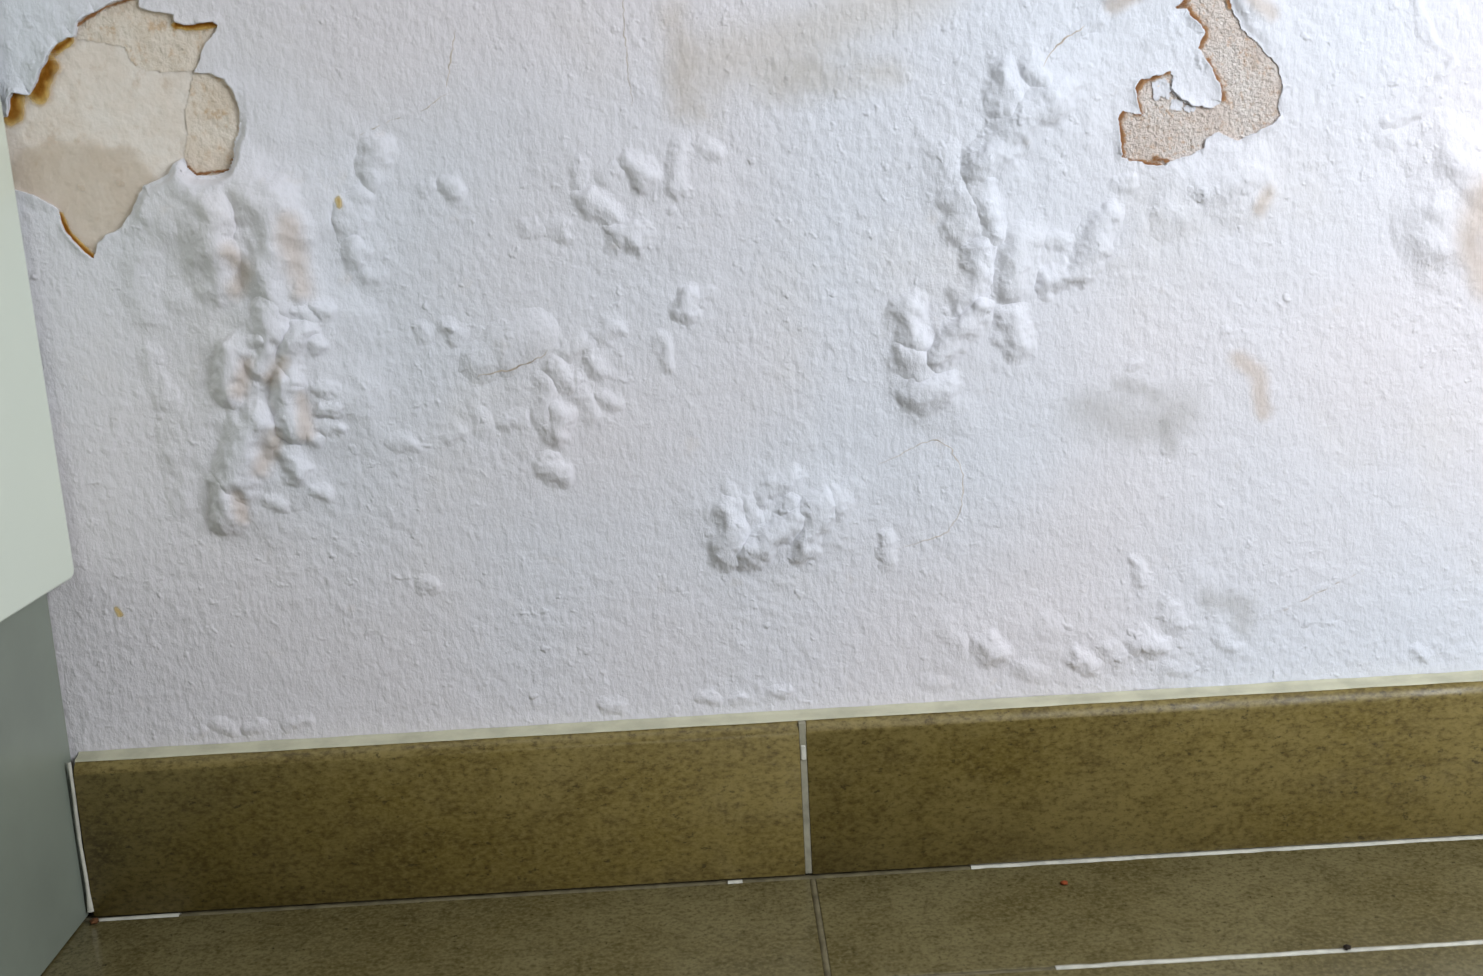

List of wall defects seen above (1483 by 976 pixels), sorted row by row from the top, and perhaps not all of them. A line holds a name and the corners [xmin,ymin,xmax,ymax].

peeling [0,0,250,268]
peeling [1109,0,1300,177]